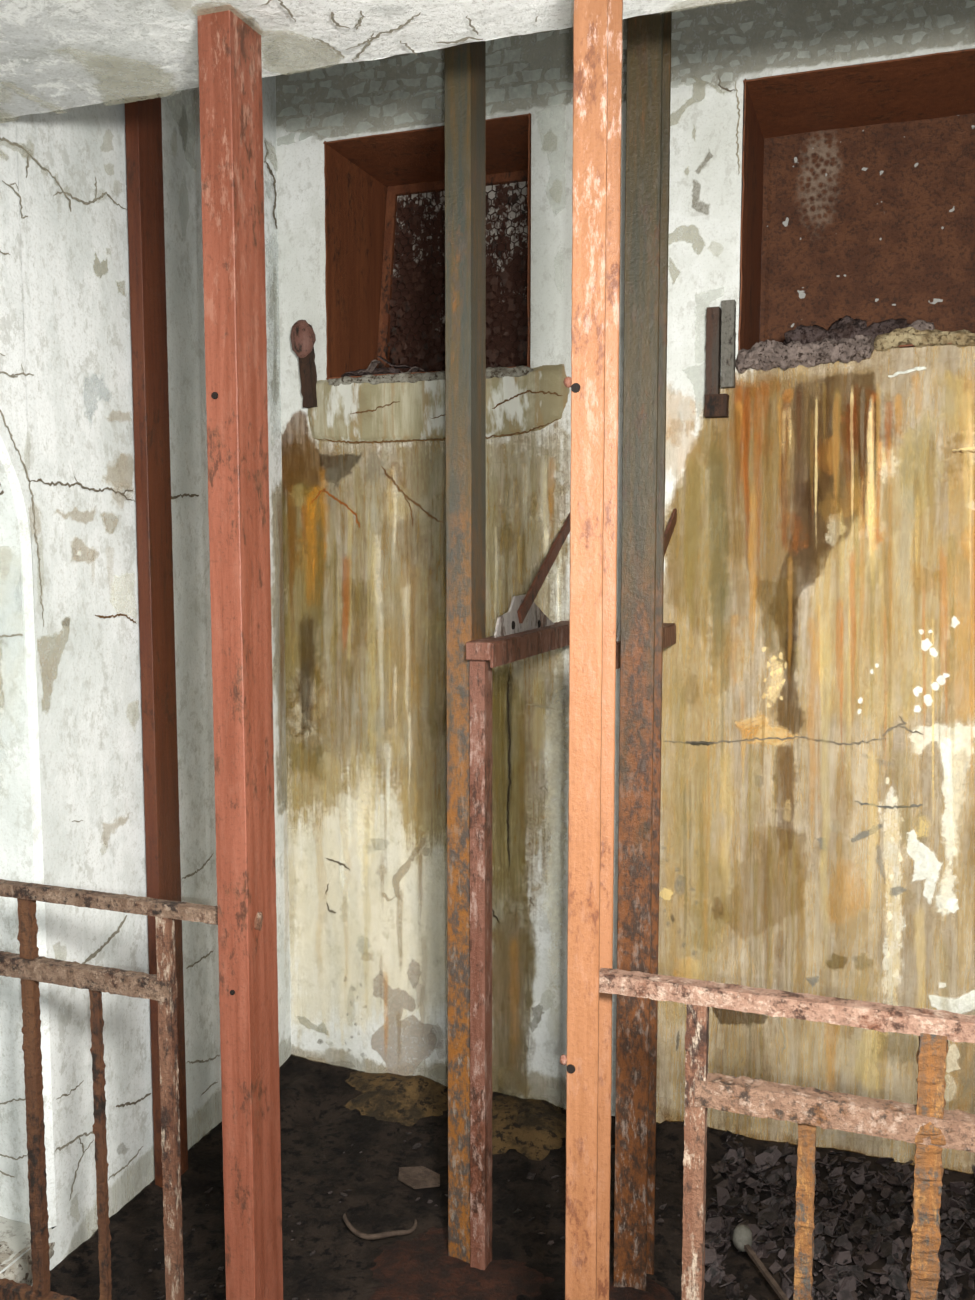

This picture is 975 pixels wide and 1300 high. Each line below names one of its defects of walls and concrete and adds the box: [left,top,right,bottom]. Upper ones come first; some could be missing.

crack [261,0,483,62]
crack [0,137,127,219]
peeling [669,152,712,254]
peeling [94,254,124,294]
peeling [874,320,975,351]
peeling [686,363,706,413]
crack [0,410,137,638]
damp [485,422,570,638]
damp [273,440,447,852]
damp [658,345,975,1015]
crack [663,716,923,746]
damp [944,1040,975,1115]